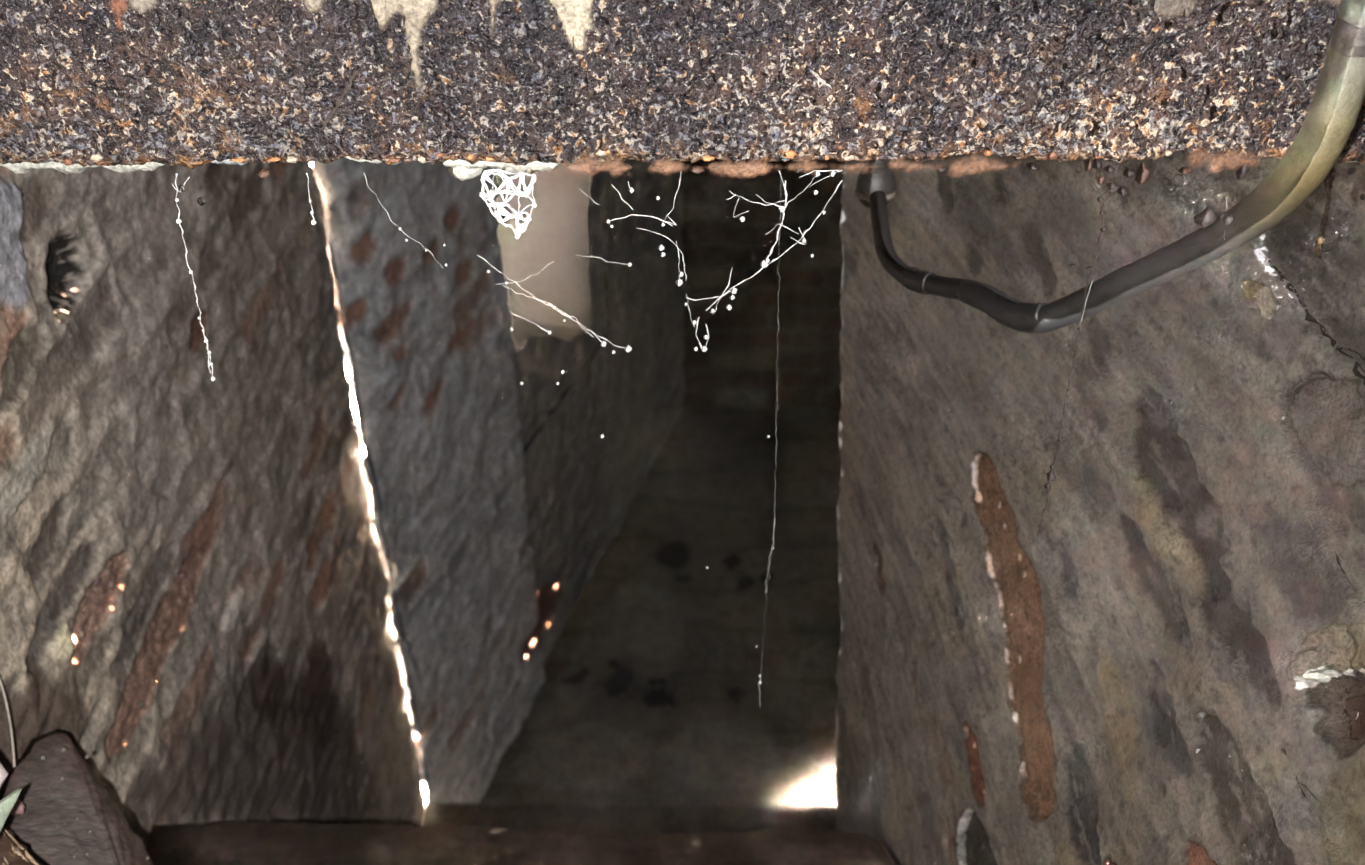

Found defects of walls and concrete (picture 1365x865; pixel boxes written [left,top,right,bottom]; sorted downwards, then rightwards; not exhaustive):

rust [111,0,127,29]
rust [64,154,104,166]
rust [257,156,298,178]
rust [570,149,629,175]
rust [652,152,770,177]
rust [784,150,855,173]
rust [891,149,1006,176]
rust [1084,147,1151,196]
rust [1178,144,1258,181]
crack [1253,241,1365,385]
crack [1335,552,1365,603]